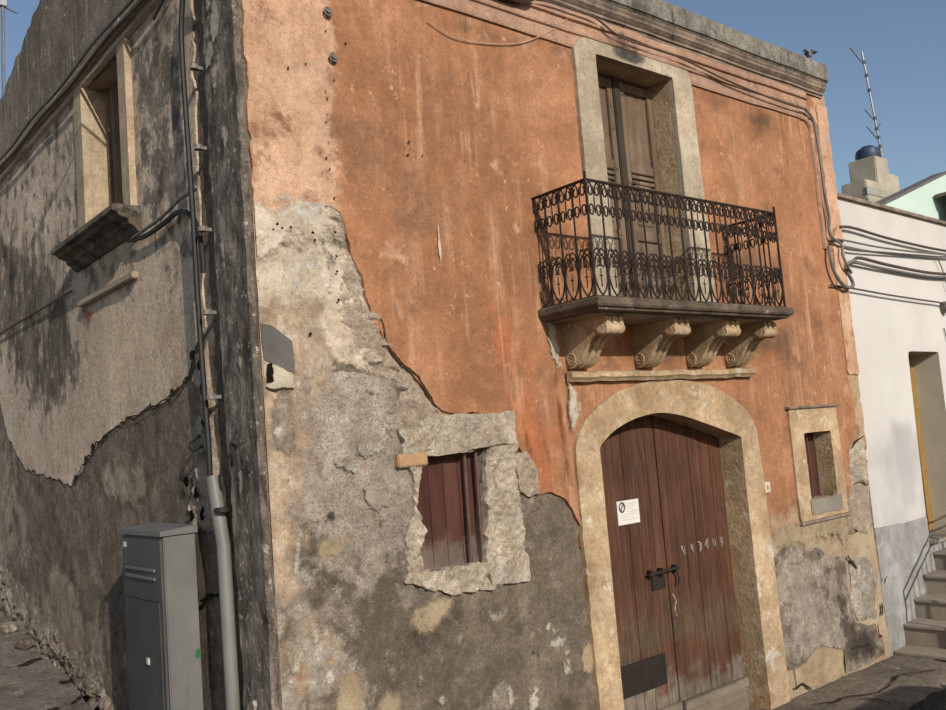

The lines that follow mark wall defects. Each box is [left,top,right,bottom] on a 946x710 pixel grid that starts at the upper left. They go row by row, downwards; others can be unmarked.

peeling [205,0,219,94]
peeling [0,333,228,710]
peeling [253,193,596,710]
peeling [771,435,891,699]